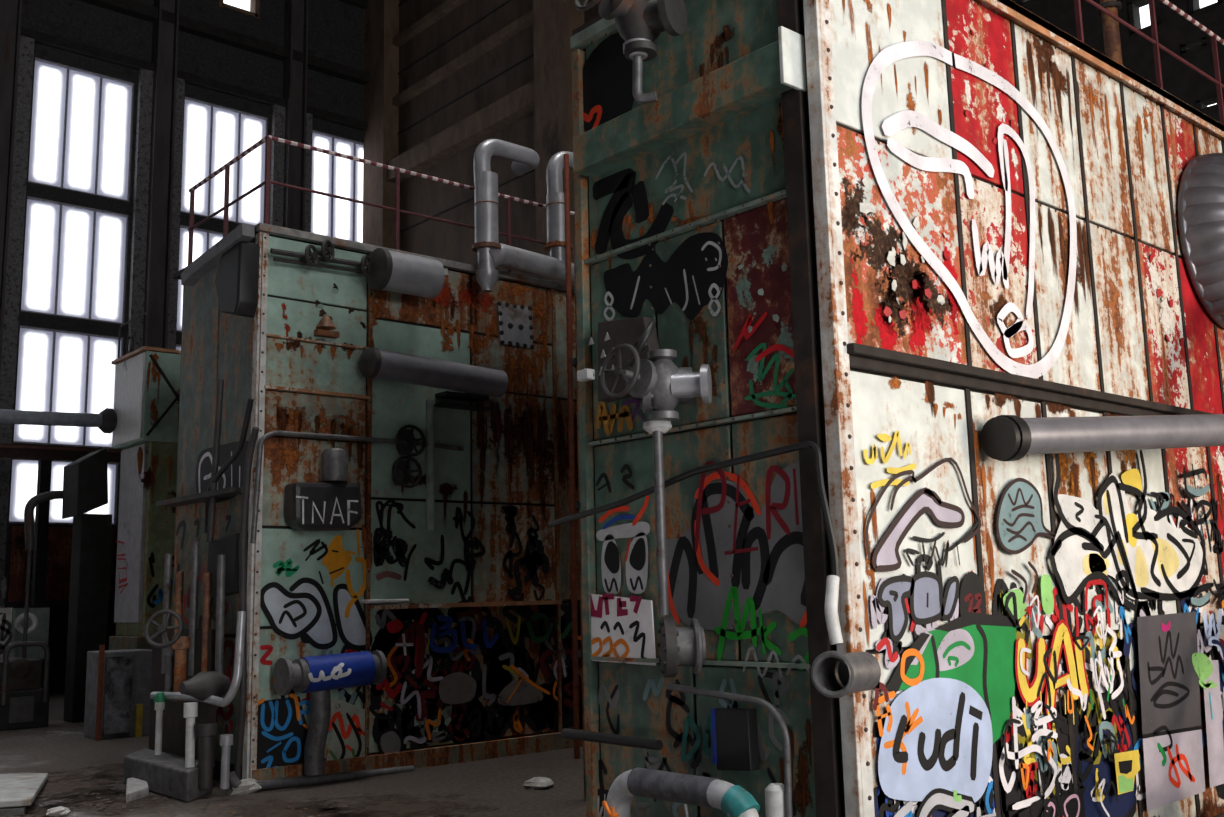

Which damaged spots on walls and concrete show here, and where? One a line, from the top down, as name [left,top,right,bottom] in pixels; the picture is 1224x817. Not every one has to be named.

corrosion [699,25,735,77]
peeling [995,88,1014,127]
corrosion [1026,36,1167,186]
corrosion [275,303,356,360]
peeling [841,176,960,356]
peeling [1146,253,1186,347]
corrosion [274,402,363,469]
corrosion [401,282,578,528]
corrosion [1207,455,1223,518]
corrosion [862,488,878,644]